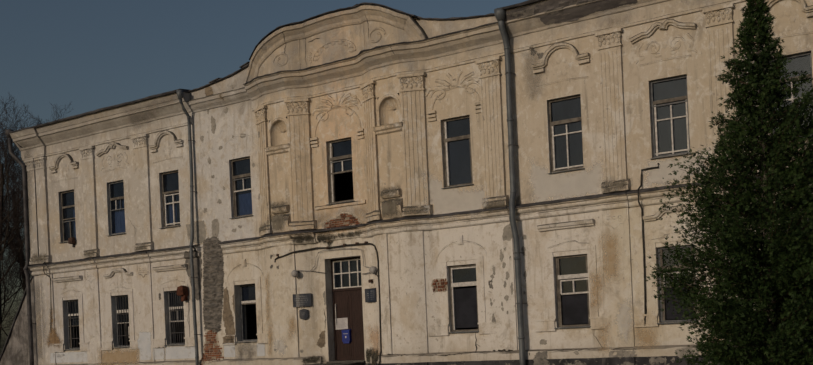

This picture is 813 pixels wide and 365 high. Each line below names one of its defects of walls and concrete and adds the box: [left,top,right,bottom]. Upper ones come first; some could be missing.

spalling [321,212,362,232]
flaking render [181,208,219,301]
spalling [431,278,448,293]
spalling [199,288,236,365]
flaking render [609,348,699,365]